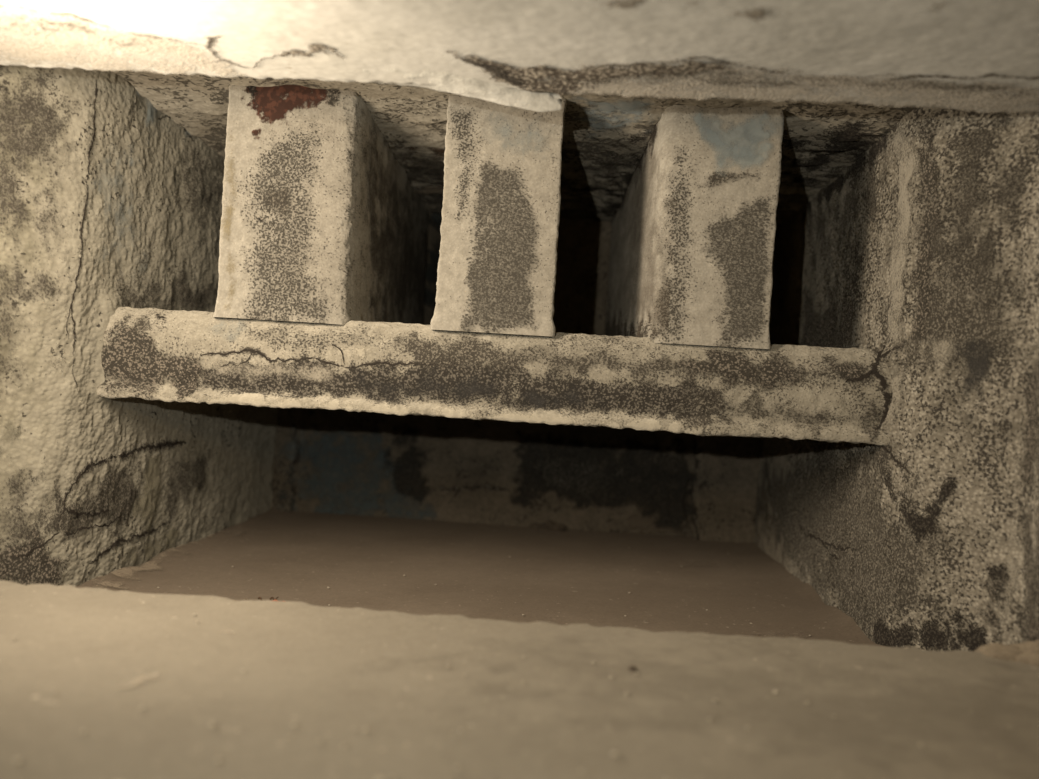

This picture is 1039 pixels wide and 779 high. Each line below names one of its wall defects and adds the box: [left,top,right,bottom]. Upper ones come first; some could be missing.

crack [0,5,342,68]
leakage [0,65,102,396]
crack [66,80,98,395]
crack [200,343,456,370]
leakage [101,97,1039,651]
crack [845,340,911,474]
leakage [0,457,145,585]
crack [18,437,186,564]